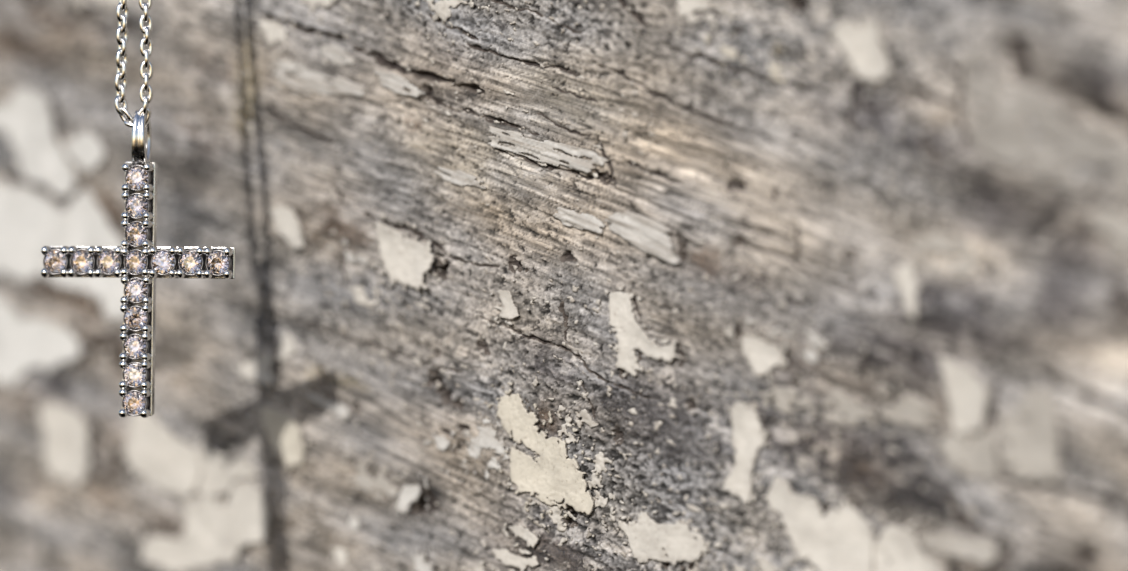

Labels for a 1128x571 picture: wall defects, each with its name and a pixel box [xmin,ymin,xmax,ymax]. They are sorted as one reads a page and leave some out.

crack [259,14,683,186]
crack [491,0,582,34]
crack [428,14,823,136]
crack [617,0,650,28]
peeling [824,4,902,98]
crack [845,41,969,149]
peeling [269,199,305,250]
peeling [330,207,451,315]
crack [479,299,655,419]
peeling [123,409,279,571]
peeling [236,333,430,571]
peeling [423,285,1067,571]